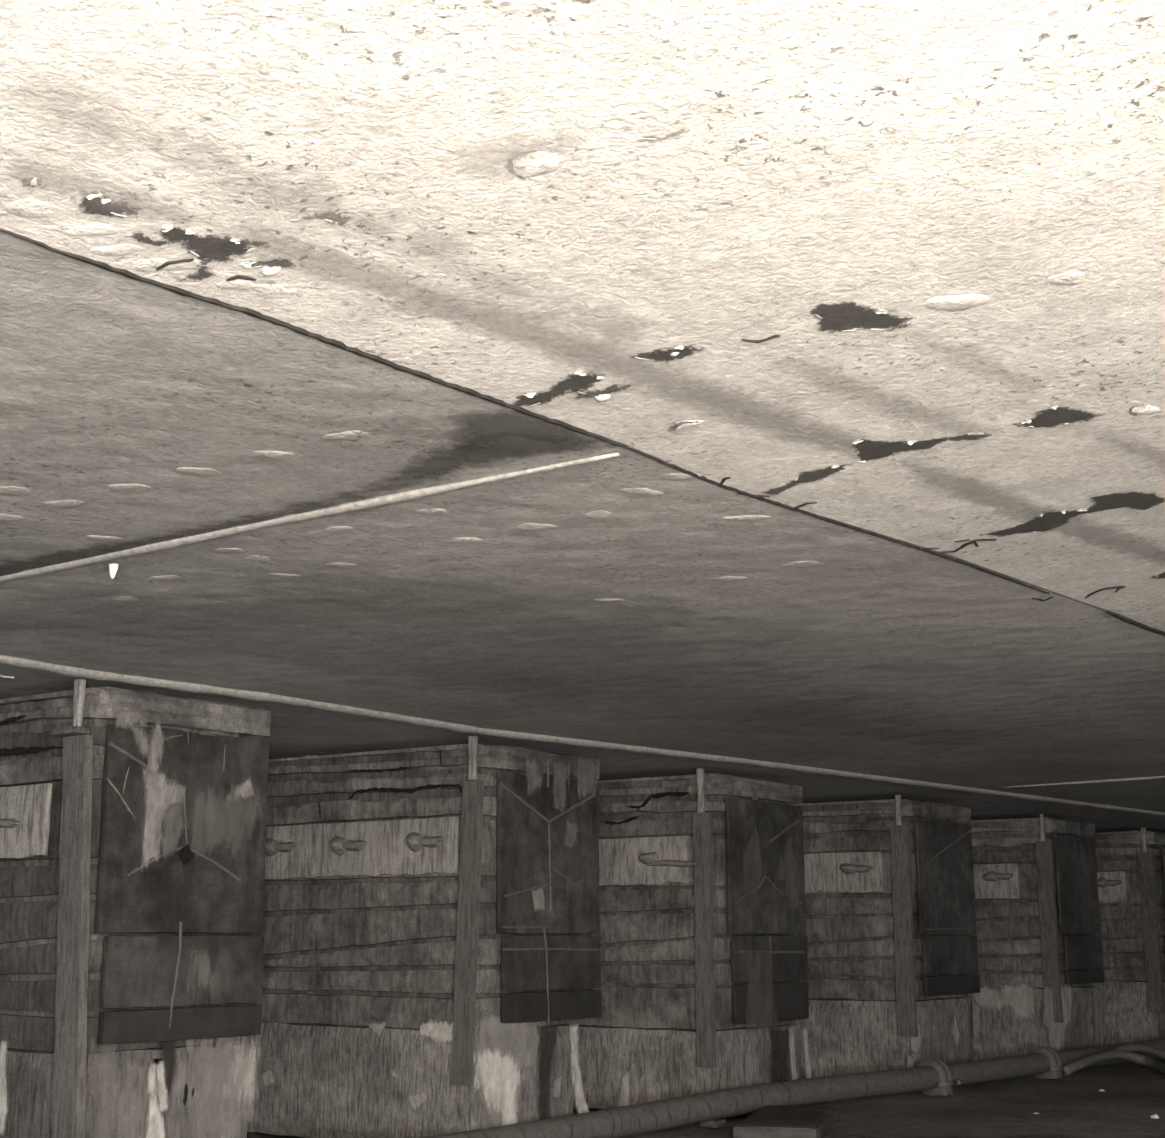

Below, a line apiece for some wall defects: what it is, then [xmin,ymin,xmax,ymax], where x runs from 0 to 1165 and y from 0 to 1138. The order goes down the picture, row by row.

peeling [80,191,139,218]
peeling [133,225,295,281]
peeling [810,301,913,332]
peeling [513,371,632,407]
water stain [428,297,850,446]
peeling [632,345,703,362]
peeling [1014,406,1103,428]
peeling [762,434,989,495]
water stain [0,413,591,576]
peeling [980,492,1165,537]